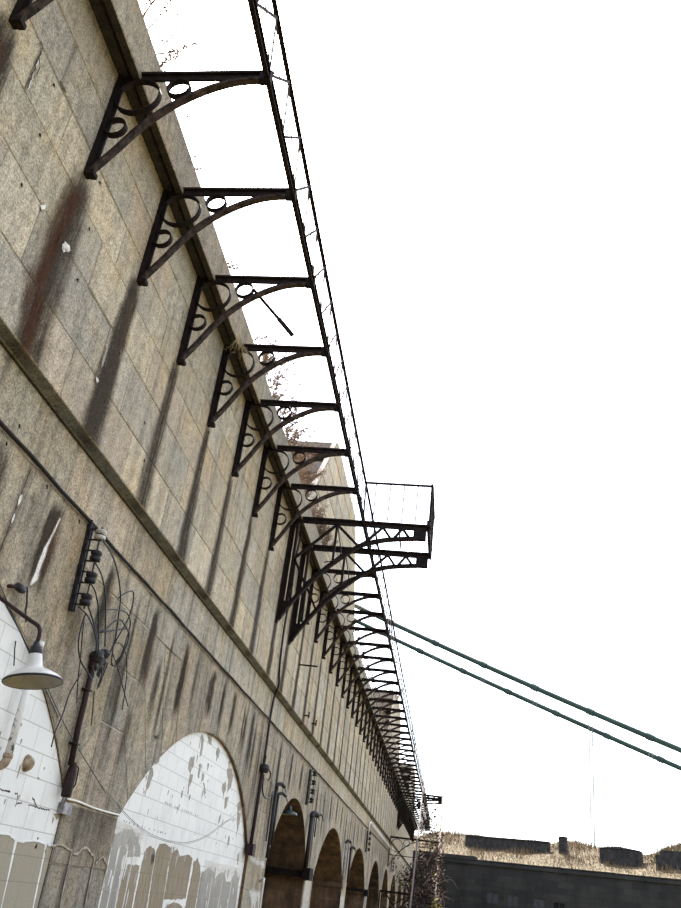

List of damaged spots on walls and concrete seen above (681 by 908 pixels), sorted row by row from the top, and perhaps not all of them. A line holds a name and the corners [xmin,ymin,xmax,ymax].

corrosion [25,187,77,347]
peeling [143,758,160,795]
peeling [165,733,245,846]
peeling [0,832,53,908]
peeling [99,809,240,908]